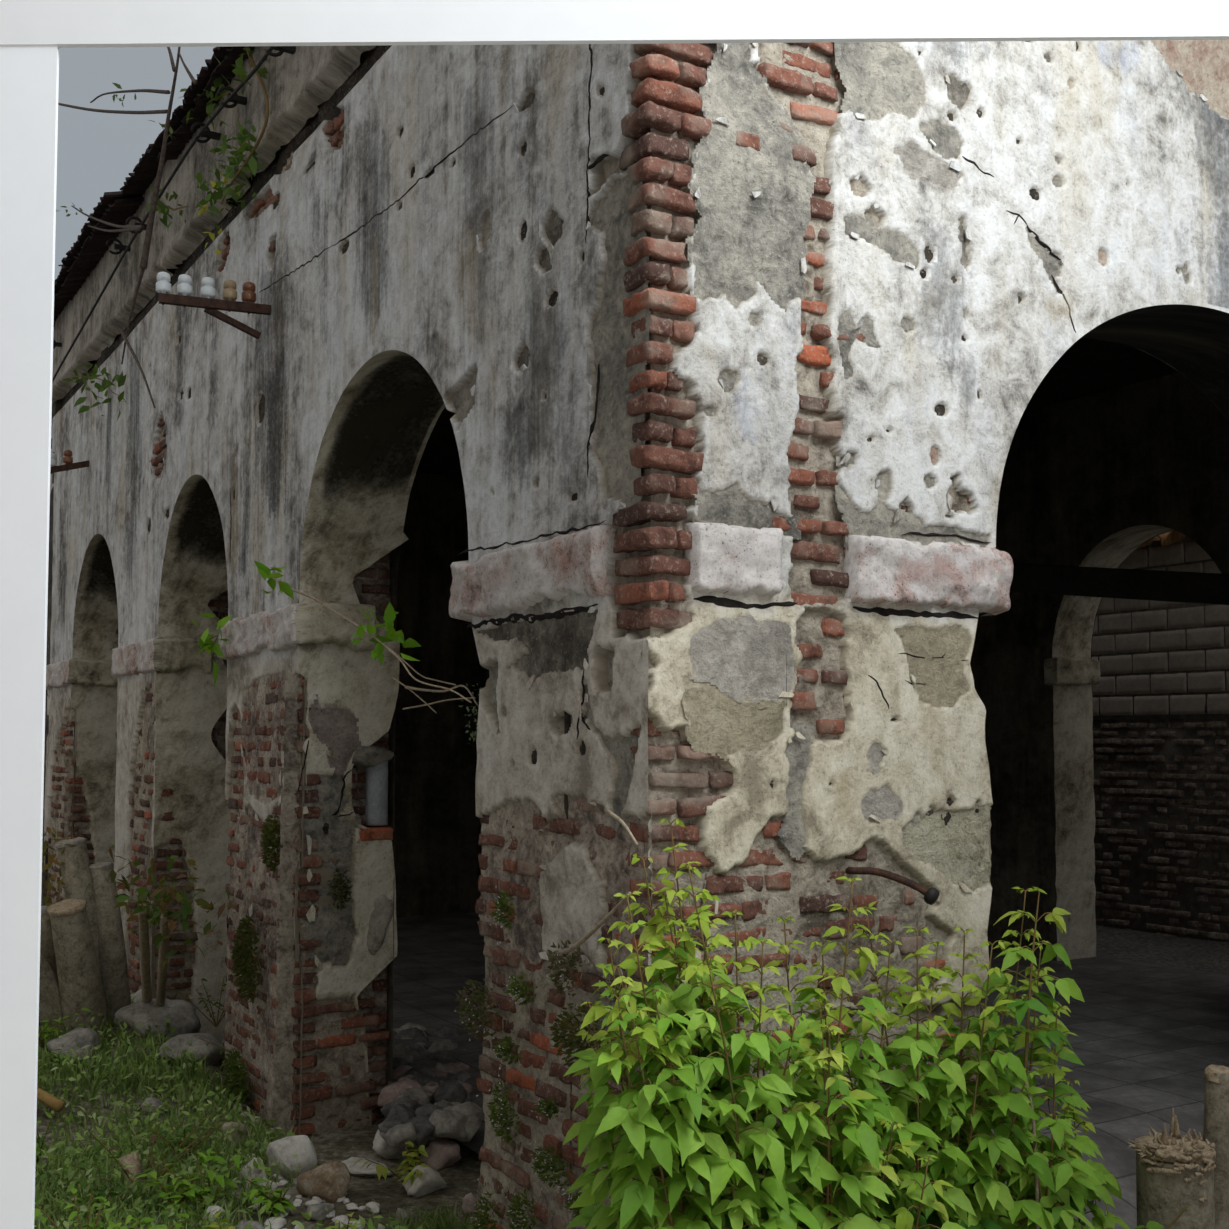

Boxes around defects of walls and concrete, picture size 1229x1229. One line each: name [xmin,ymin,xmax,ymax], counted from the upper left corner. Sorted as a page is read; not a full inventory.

spalling [1151,40,1229,118]
water stain [1196,101,1229,308]
crack [1006,210,1076,333]
flaking render [353,552,391,626]
crack [458,520,606,555]
crack [467,604,598,629]
peeling [472,42,991,1229]
crack [693,596,798,609]
crack [902,532,990,543]
flaking render [47,696,109,904]
flaking render [127,683,198,1002]
flaking render [211,670,390,1140]